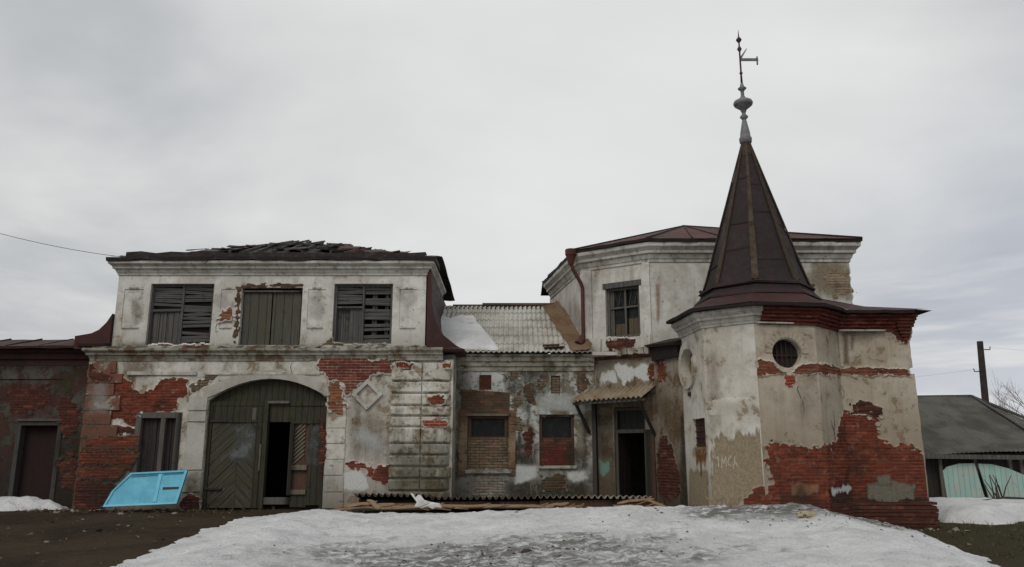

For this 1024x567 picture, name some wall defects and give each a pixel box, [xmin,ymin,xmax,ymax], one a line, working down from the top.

flaking render [810,262,857,299]
flaking render [215,283,304,343]
flaking render [573,371,591,402]
flaking render [755,357,912,389]
flaking render [315,337,416,476]
flaking render [507,371,549,459]
flaking render [55,362,220,510]
flaking render [344,459,390,487]
flaking render [467,468,510,498]
flaking render [539,472,569,494]
flaking render [656,398,928,511]